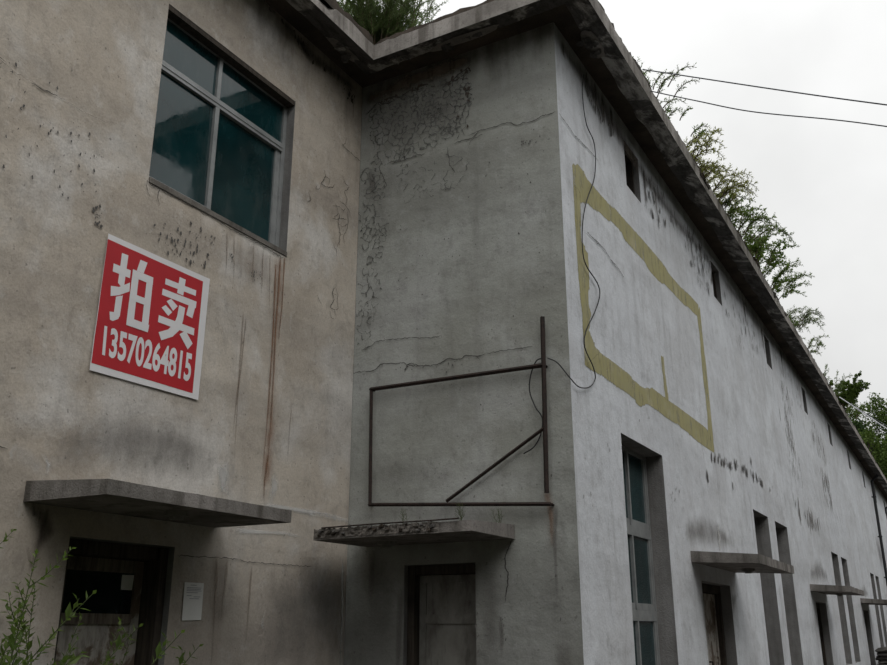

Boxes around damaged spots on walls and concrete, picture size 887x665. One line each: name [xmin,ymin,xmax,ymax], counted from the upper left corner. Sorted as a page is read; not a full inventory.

crack [308,70,598,373]
water stain [563,48,703,268]
corrosion [266,258,285,431]
spalling [314,517,459,538]